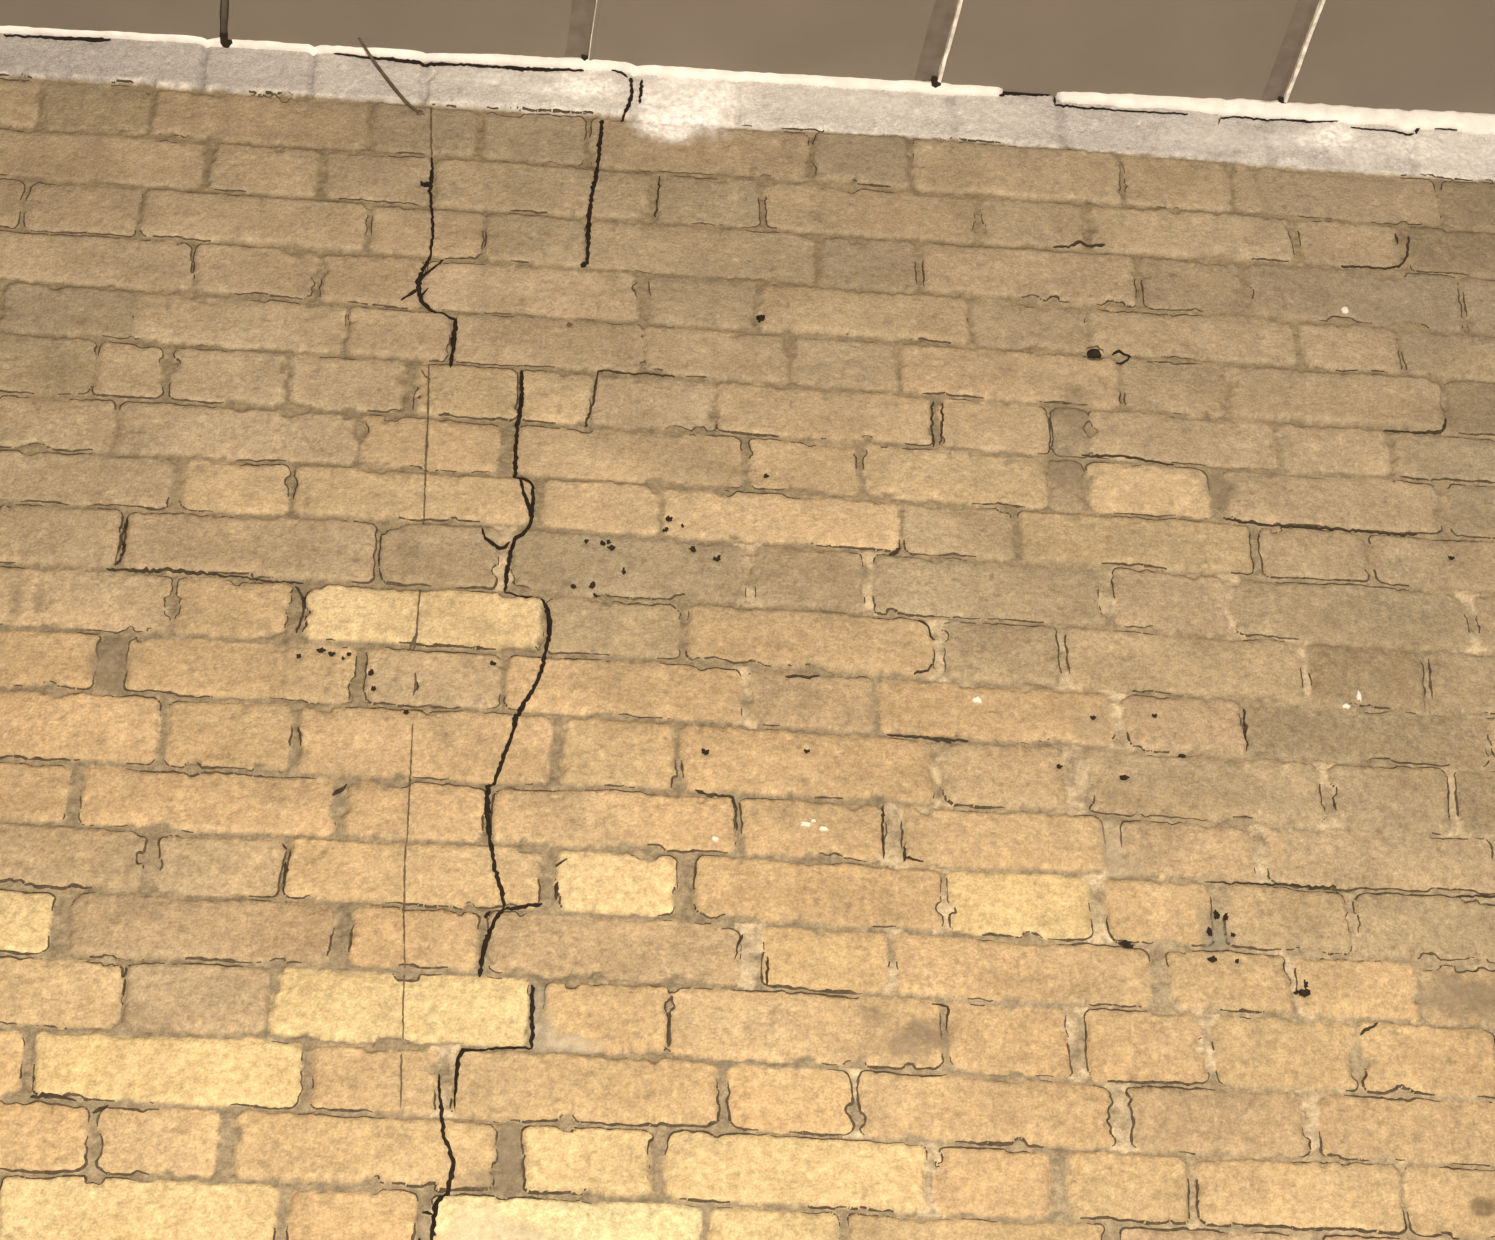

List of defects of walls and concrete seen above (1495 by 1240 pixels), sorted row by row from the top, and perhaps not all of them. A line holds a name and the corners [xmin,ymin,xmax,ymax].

crack [4,34,111,42]
crack [401,107,458,524]
crack [334,53,644,268]
crack [478,370,553,977]
crack [400,590,536,1240]